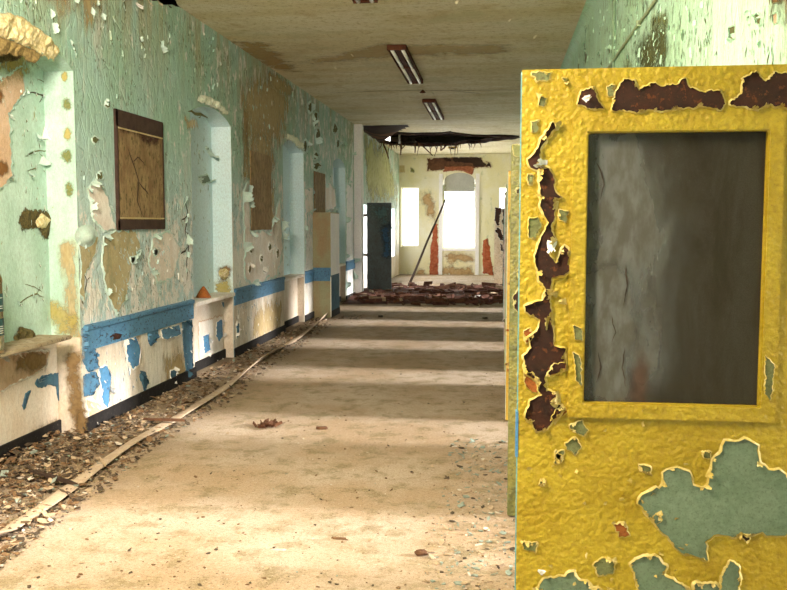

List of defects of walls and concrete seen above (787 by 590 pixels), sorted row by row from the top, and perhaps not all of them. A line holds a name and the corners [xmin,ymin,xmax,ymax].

peeling [562,0,717,85]
water stain [625,14,669,68]
flaking render [162,21,361,296]
water stain [241,42,292,230]
flaking render [78,140,221,347]
peeling [527,216,557,254]
flaking render [14,327,36,341]
flaking render [147,302,259,361]
flaking render [86,332,149,423]
peeling [553,419,589,465]
peeling [636,436,787,563]
peeling [531,556,618,590]